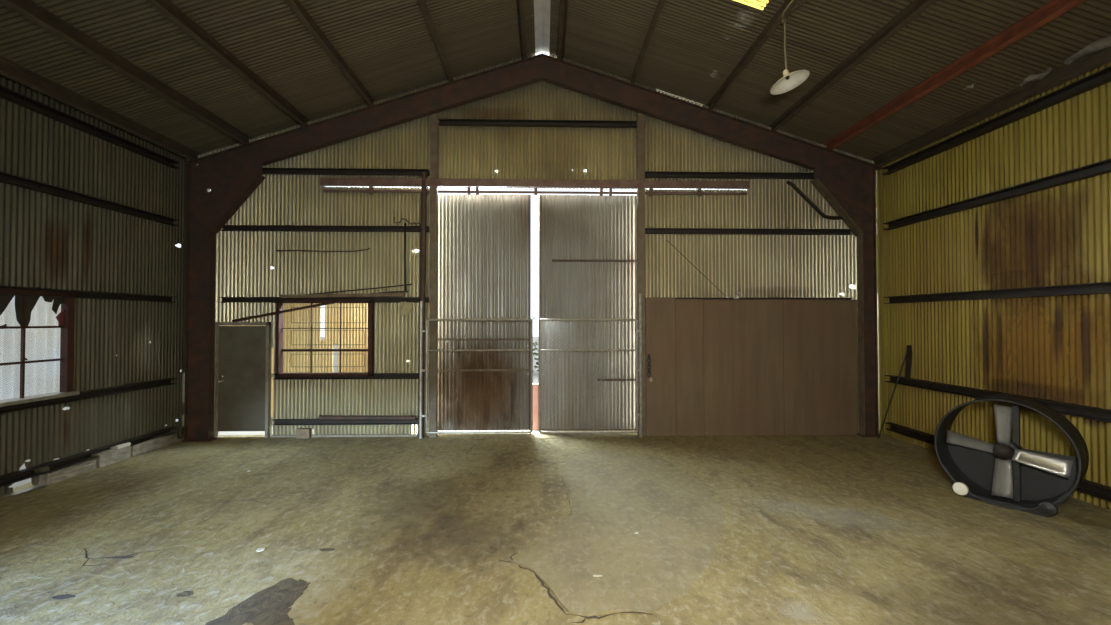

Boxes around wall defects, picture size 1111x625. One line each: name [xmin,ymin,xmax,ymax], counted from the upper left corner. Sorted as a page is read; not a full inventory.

crack [500,552,653,623]